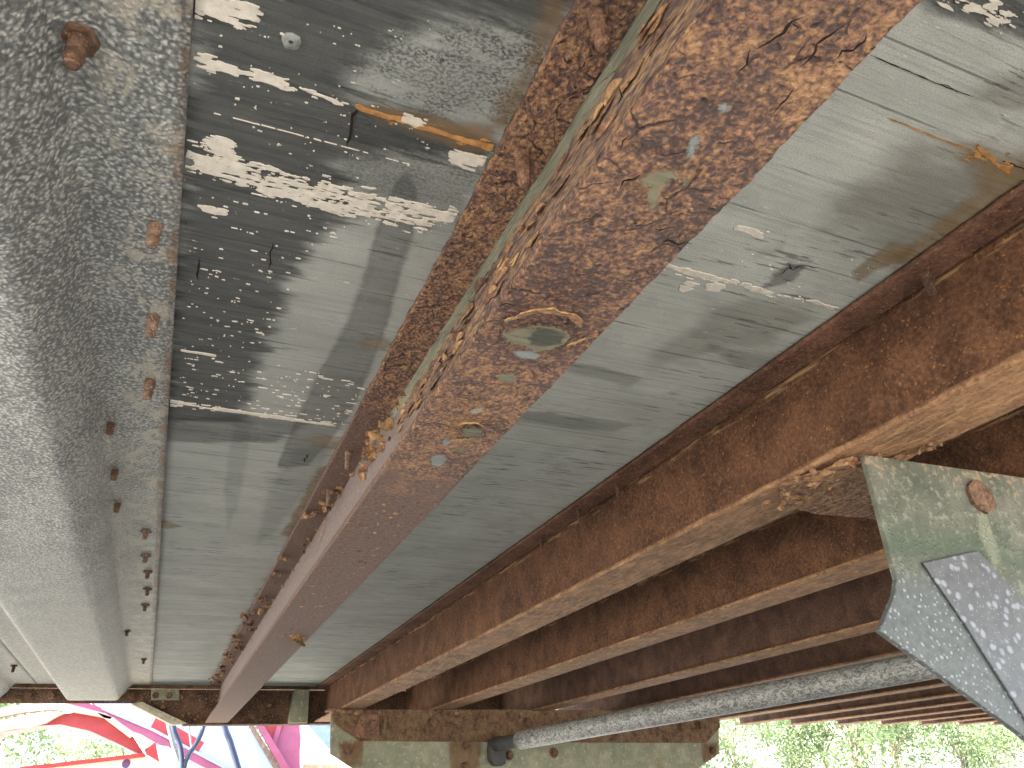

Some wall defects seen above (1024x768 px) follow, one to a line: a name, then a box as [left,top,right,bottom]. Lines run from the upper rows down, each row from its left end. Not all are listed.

peeling [194,0,284,38]
peeling [937,0,1024,34]
rust [576,3,677,142]
crack [736,15,973,112]
peeling [193,35,368,160]
peeling [395,112,430,149]
rust [355,104,494,151]
peeling [448,149,487,172]
rust [964,141,1014,174]
rust [396,152,570,433]
peeling [170,248,365,427]
rust [505,307,586,346]